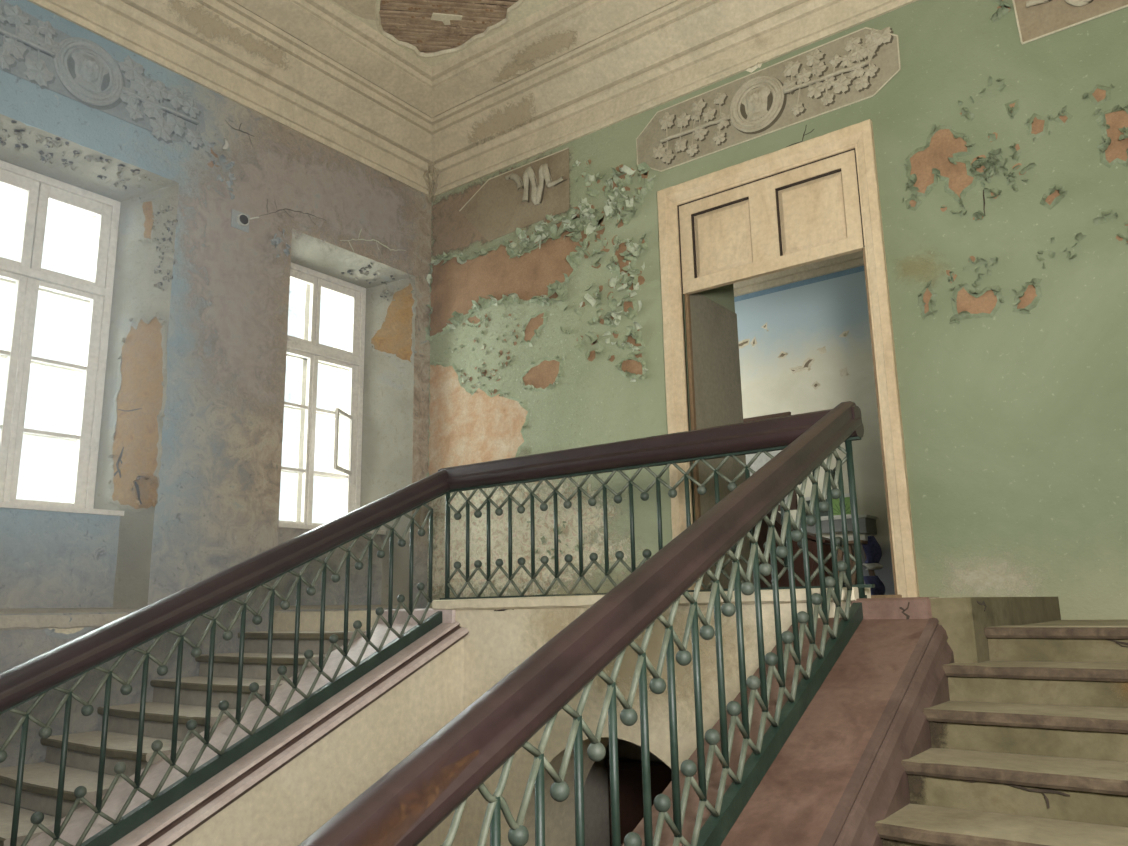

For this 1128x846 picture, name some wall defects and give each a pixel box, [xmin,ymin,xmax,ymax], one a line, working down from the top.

spalling [330,0,525,58]
peeling [0,120,178,291]
peeling [341,159,651,477]
peeling [902,75,1073,221]
peeling [917,209,1128,324]
peeling [1081,83,1128,168]
spalling [107,311,168,513]